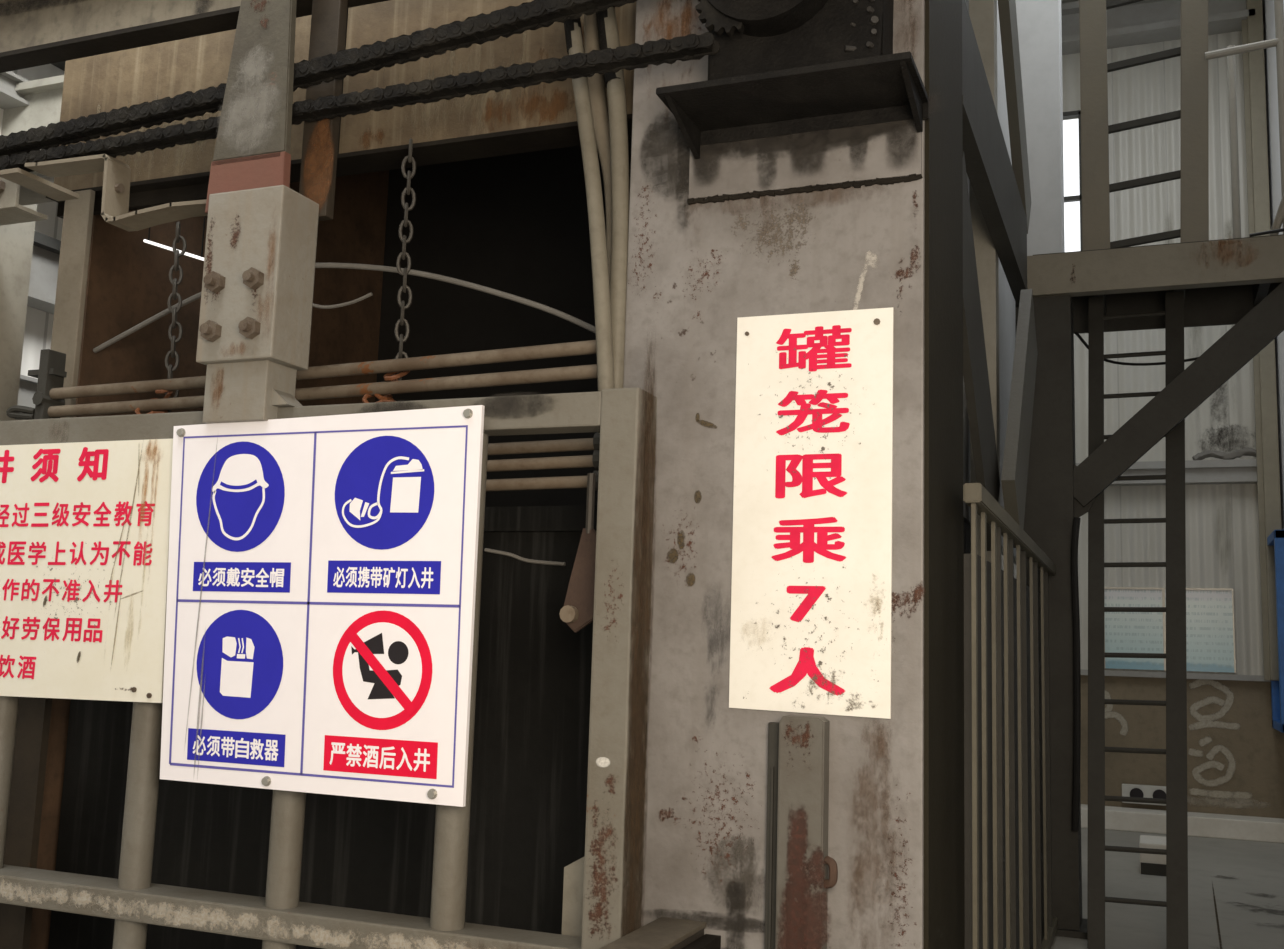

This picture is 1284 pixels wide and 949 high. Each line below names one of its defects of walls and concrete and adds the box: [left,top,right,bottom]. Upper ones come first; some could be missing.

leakage [678,129,721,224]
leakage [791,130,825,171]
leakage [850,136,867,160]
leakage [887,119,916,162]
corrosion [588,345,759,936]
corrosion [777,808,830,949]